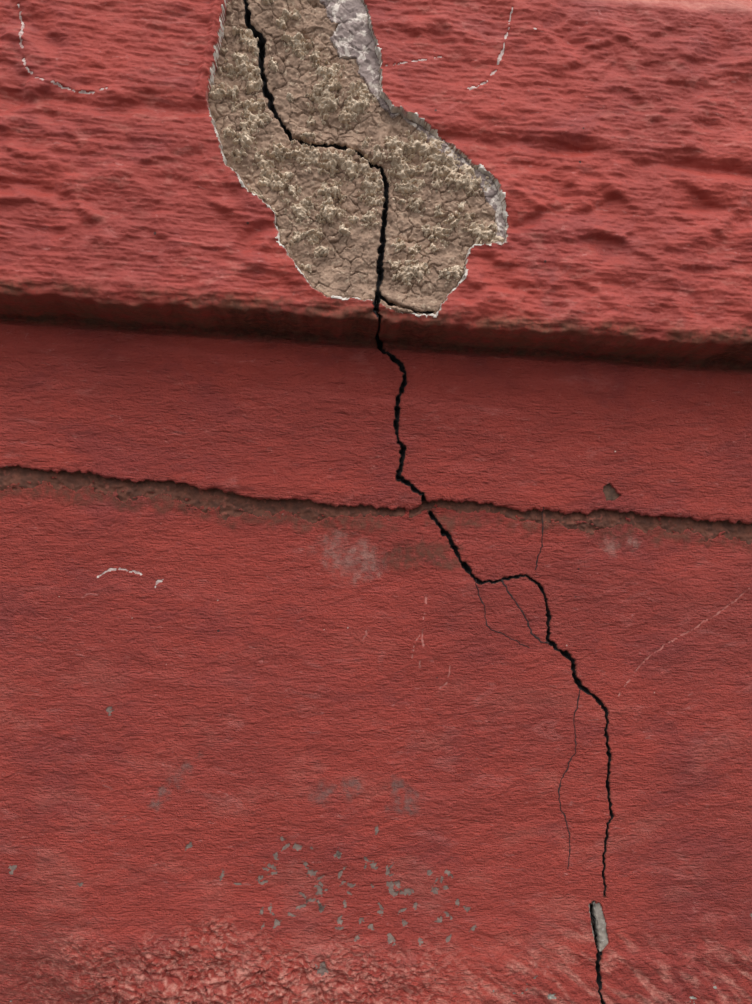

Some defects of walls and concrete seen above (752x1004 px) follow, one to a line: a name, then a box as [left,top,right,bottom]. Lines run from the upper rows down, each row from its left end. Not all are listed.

spalling [207,0,508,318]
crack [244,0,750,1004]
peeling [256,836,328,929]
peeling [333,851,356,930]
peeling [364,856,418,926]
peeling [589,901,608,951]